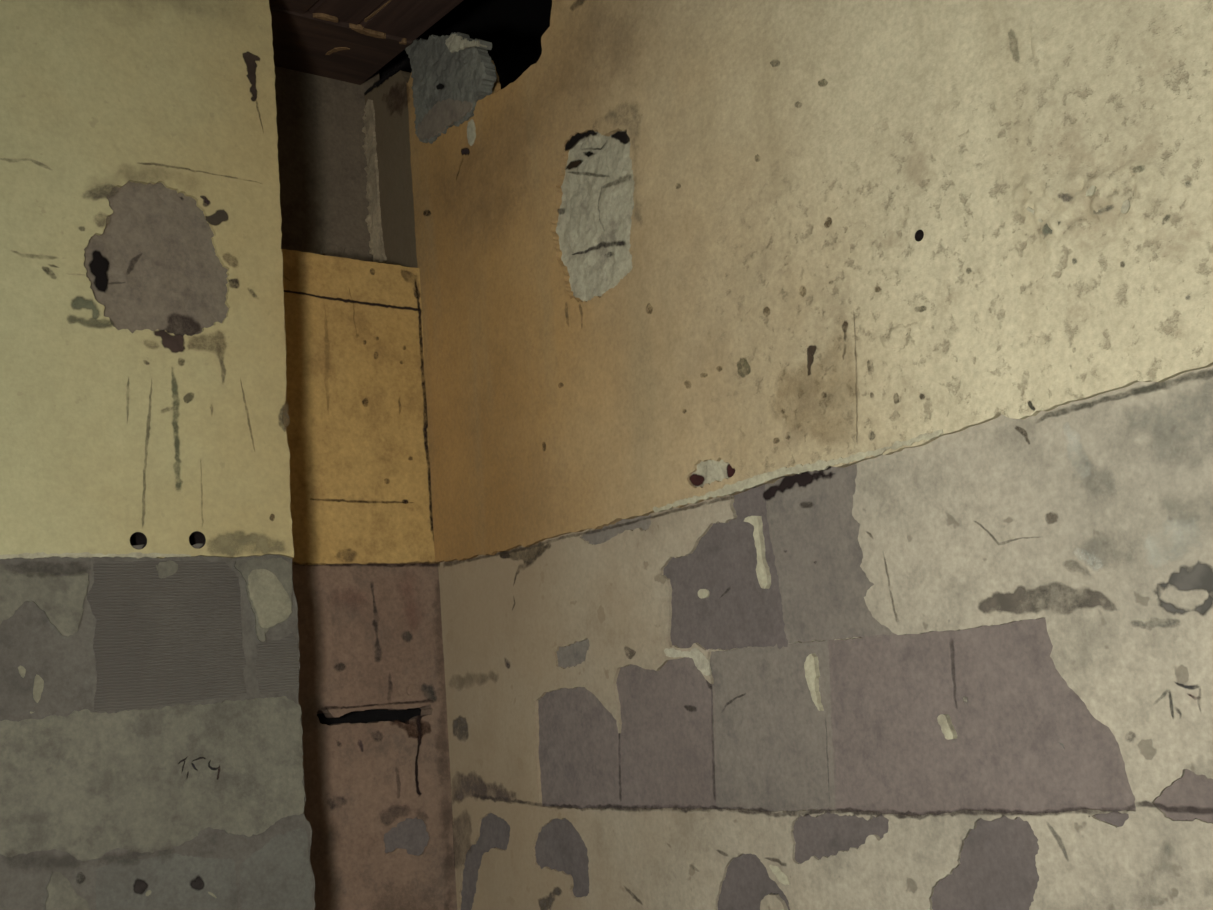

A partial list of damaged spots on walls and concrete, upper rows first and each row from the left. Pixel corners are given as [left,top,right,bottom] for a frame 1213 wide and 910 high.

peeling [461,119,476,155]
spalling [201,196,228,226]
spalling [556,130,634,318]
peeling [68,297,113,328]
spalling [154,330,225,354]
crack [1042,371,1213,420]
leakage [145,360,194,489]
peeling [248,569,292,628]
peeling [18,665,44,714]
spalling [535,460,1136,910]
crack [414,715,422,796]
crack [475,795,1213,819]